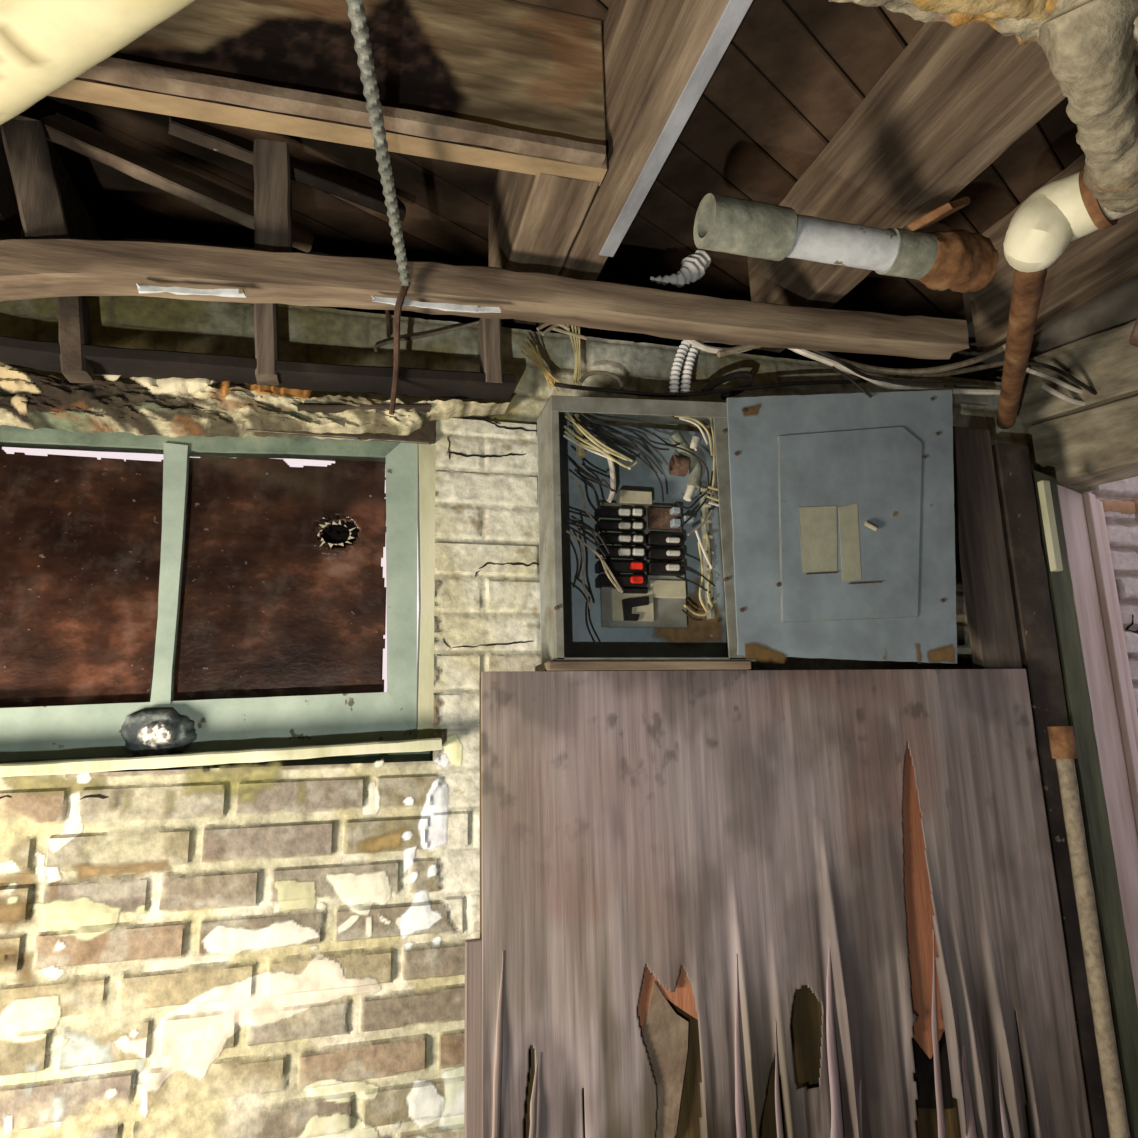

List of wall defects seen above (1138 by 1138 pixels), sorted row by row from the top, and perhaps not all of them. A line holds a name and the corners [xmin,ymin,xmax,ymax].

peeling [0,362,40,414]
peeling [104,375,215,394]
crack [475,562,540,577]
crack [80,793,108,801]
peeling [0,734,462,1117]
peeling [51,1096,63,1129]
peeling [298,1079,379,1138]
peeling [392,1066,464,1138]